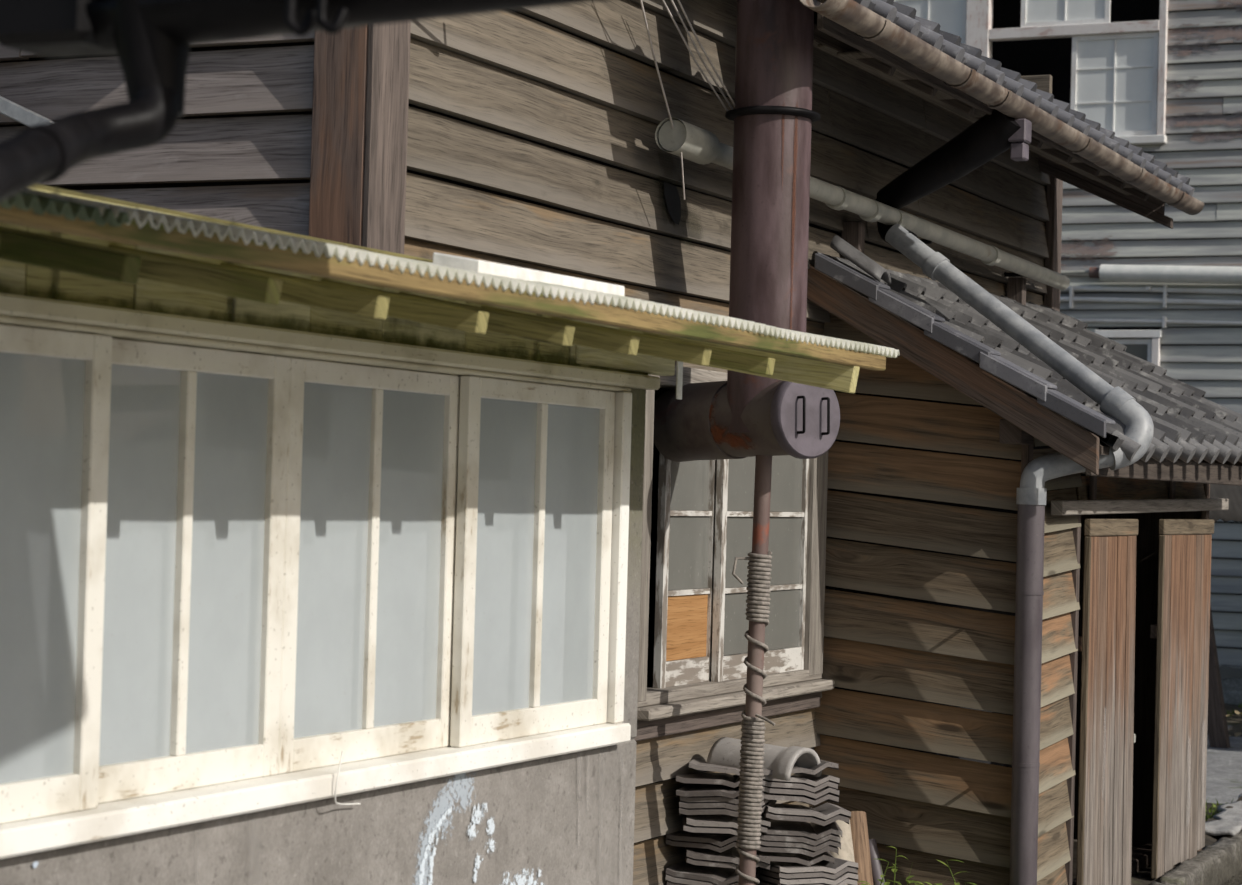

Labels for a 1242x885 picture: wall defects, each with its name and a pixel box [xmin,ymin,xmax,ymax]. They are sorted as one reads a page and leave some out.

peeling [1167,0,1242,56]
peeling [1166,77,1203,97]
peeling [1165,111,1242,142]
leakage [413,773,495,885]
leakage [503,868,543,885]